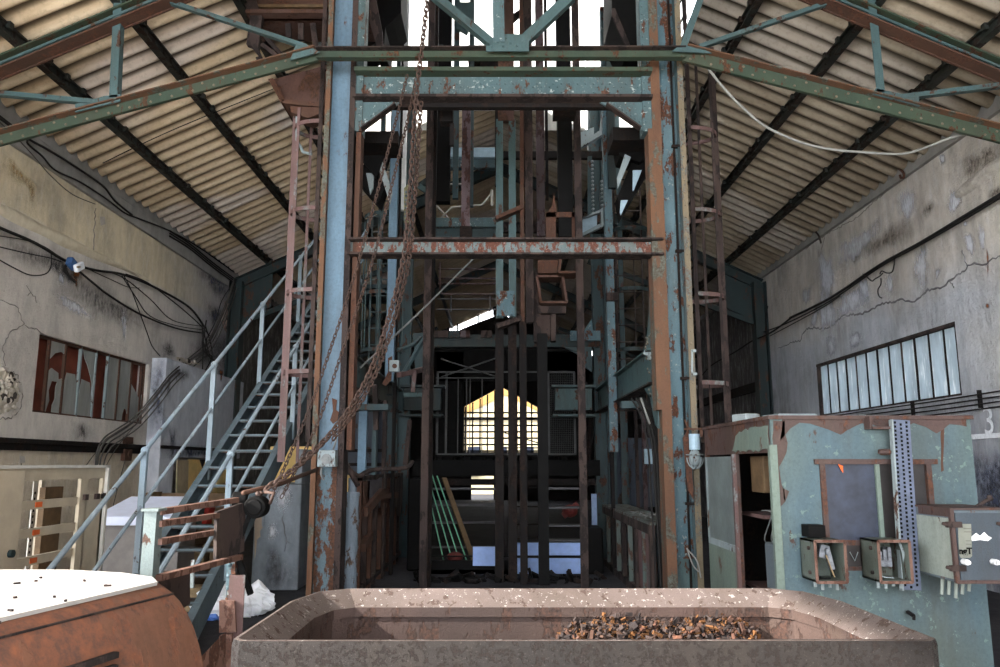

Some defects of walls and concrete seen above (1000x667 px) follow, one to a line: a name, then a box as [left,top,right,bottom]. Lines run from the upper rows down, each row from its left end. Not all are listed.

crack [778,250,1000,348]
spalling [0,366,23,416]
crack [0,285,43,420]